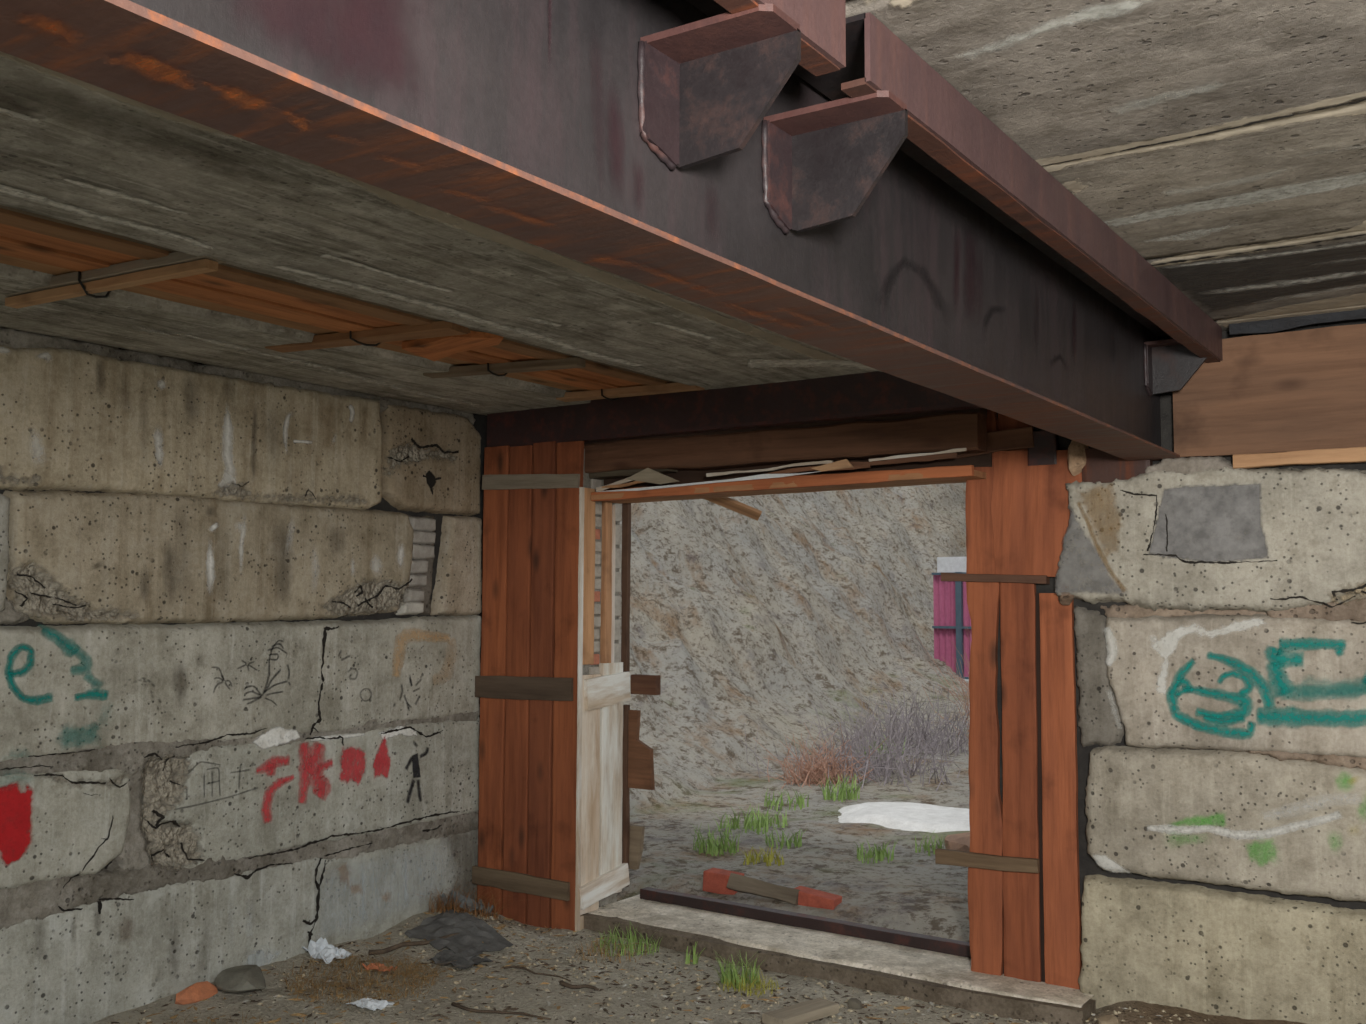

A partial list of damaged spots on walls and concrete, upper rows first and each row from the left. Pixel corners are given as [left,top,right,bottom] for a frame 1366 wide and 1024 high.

spalling [8,563,136,622]
spalling [323,579,413,616]
crack [306,626,344,746]
crack [1,749,95,770]
crack [144,728,266,760]
crack [381,726,443,738]
spalling [34,754,204,870]
crack [58,816,134,914]
crack [234,811,460,952]